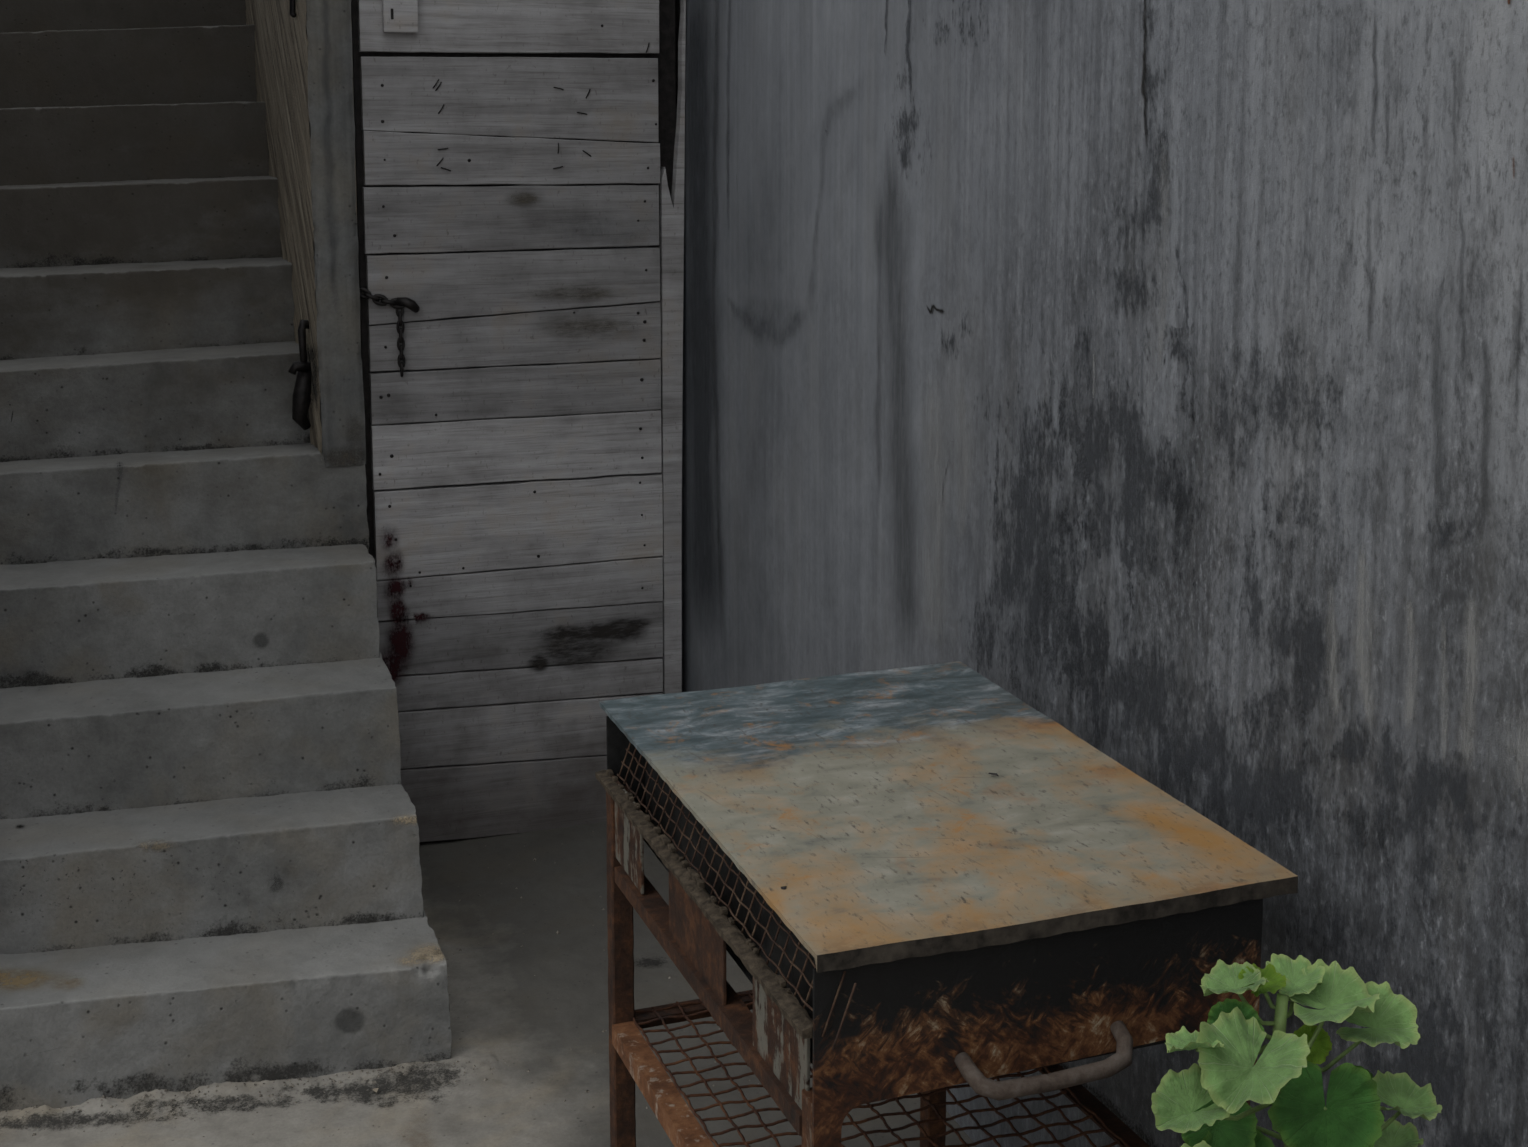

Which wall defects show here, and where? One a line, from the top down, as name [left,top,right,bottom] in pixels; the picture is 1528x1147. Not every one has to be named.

water stain [1120,0,1168,235]
water stain [969,333,1520,902]